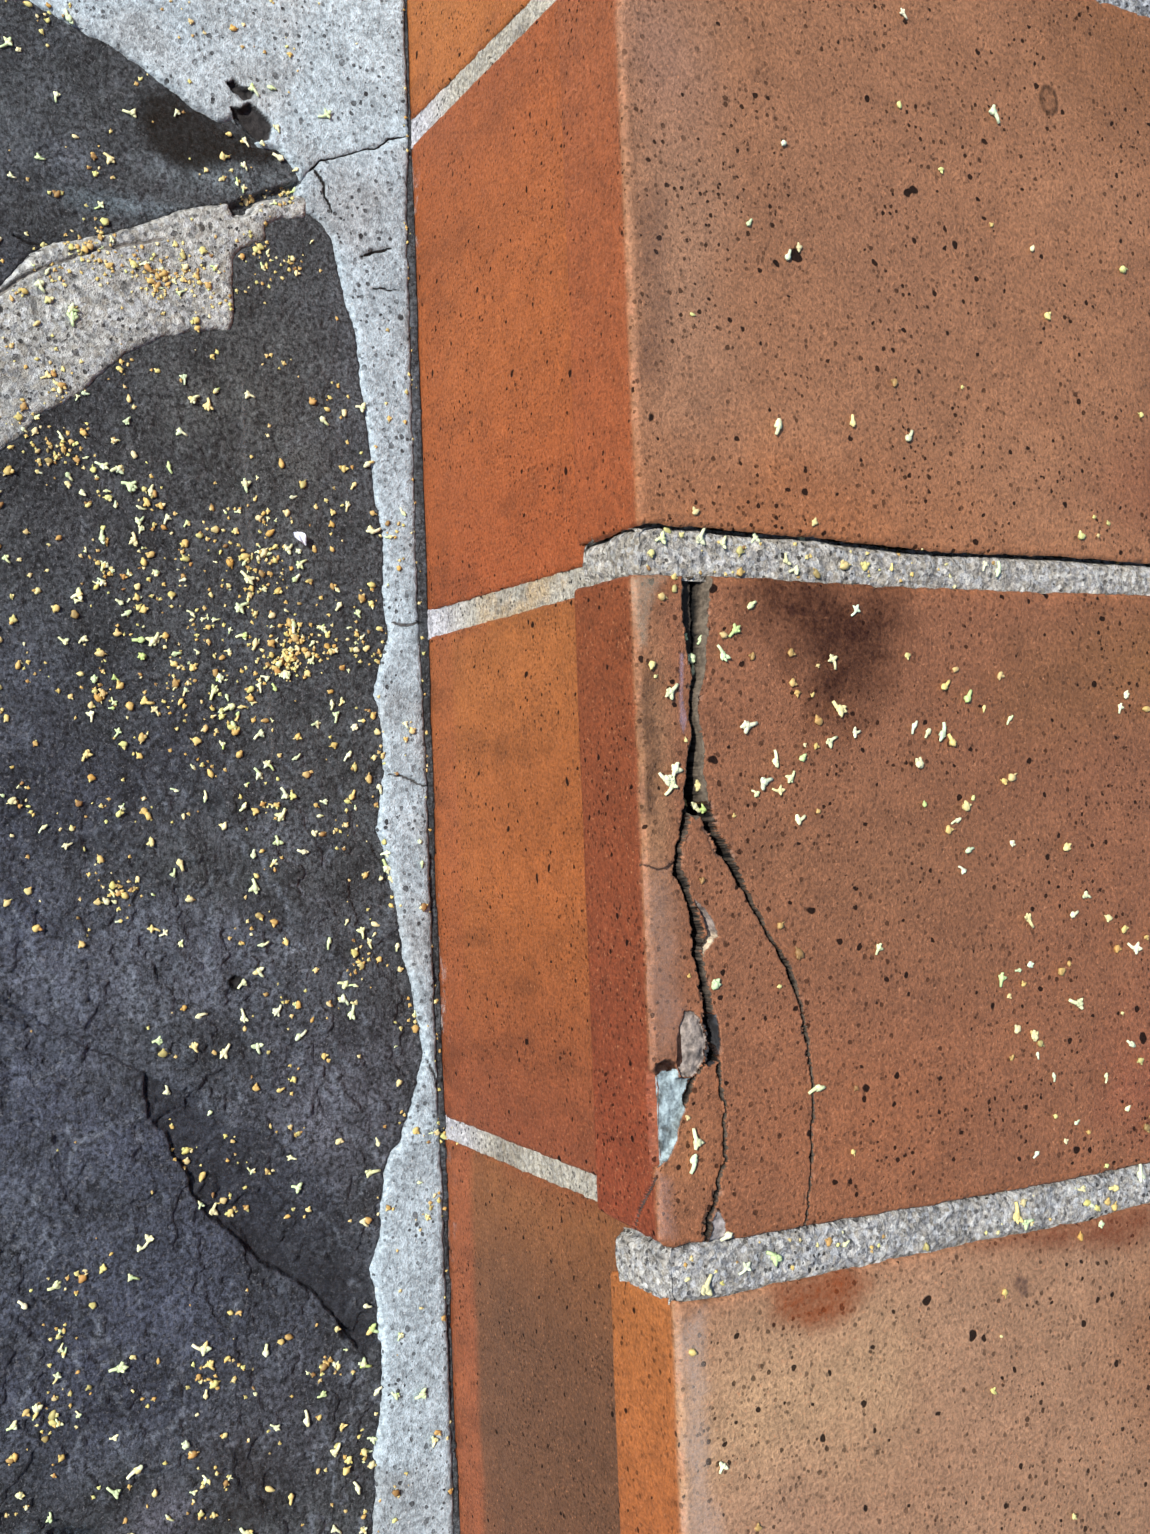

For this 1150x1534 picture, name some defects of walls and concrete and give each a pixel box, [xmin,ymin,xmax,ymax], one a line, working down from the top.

water stain [144,93,273,169]
crack [309,137,404,213]
water stain [769,580,887,702]
crack [639,576,815,1242]
spalling [655,1011,721,1168]
crack [634,1177,657,1230]